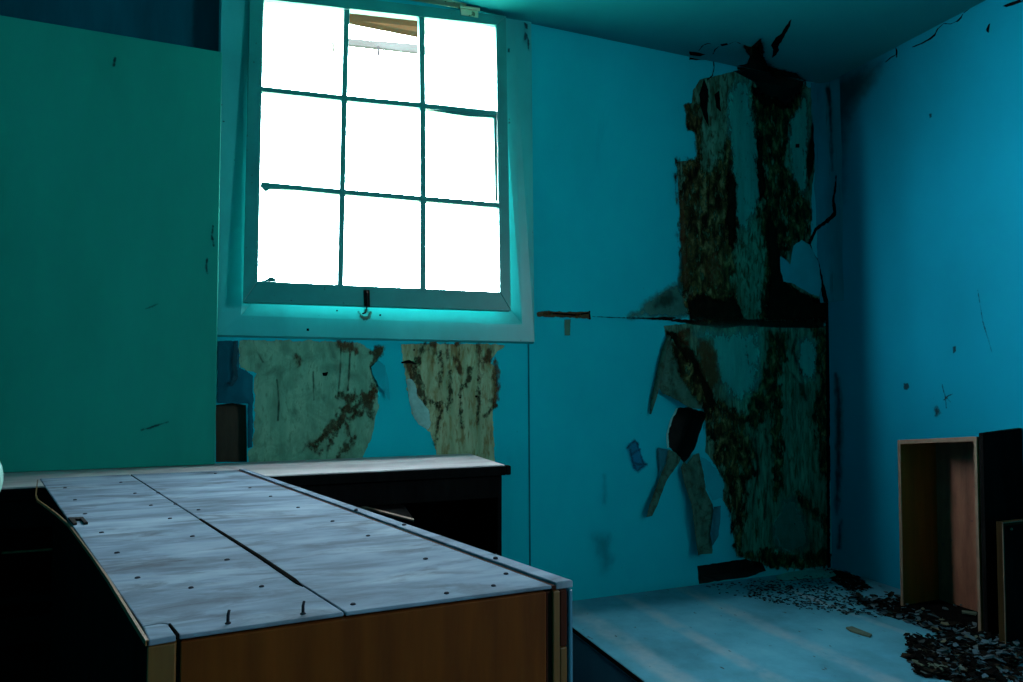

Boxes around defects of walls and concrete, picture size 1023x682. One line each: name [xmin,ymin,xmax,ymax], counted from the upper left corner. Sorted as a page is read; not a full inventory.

crack [771,19,792,58]
crack [807,175,837,304]
crack [592,314,676,322]
peeling [664,38,832,571]
peeling [238,339,390,462]
peeling [401,341,504,462]